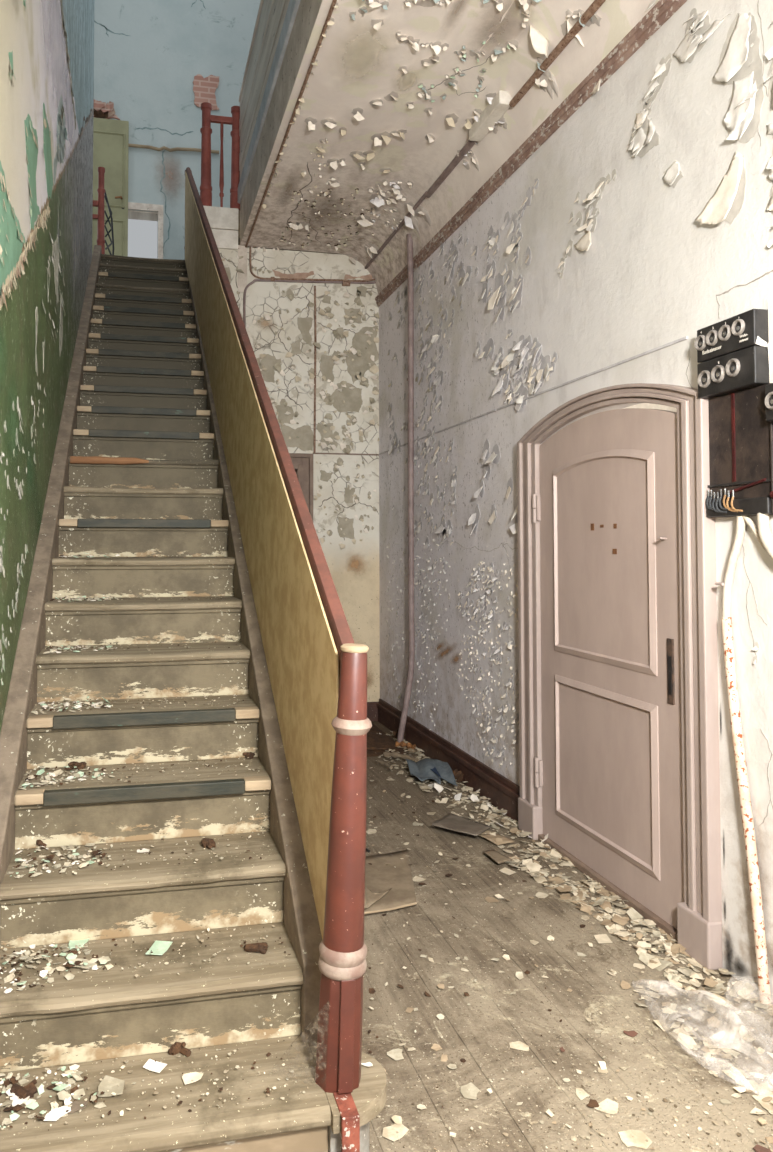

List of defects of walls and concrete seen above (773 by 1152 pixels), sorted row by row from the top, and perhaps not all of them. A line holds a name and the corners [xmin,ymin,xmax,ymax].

flaking render [193,74,219,111]
peeling [561,9,602,47]
peeling [627,8,773,225]
peeling [0,0,77,499]
peeling [557,169,616,278]
crack [254,296,379,410]
peeling [222,0,558,712]
peeling [0,538,28,685]
peeling [456,562,519,765]